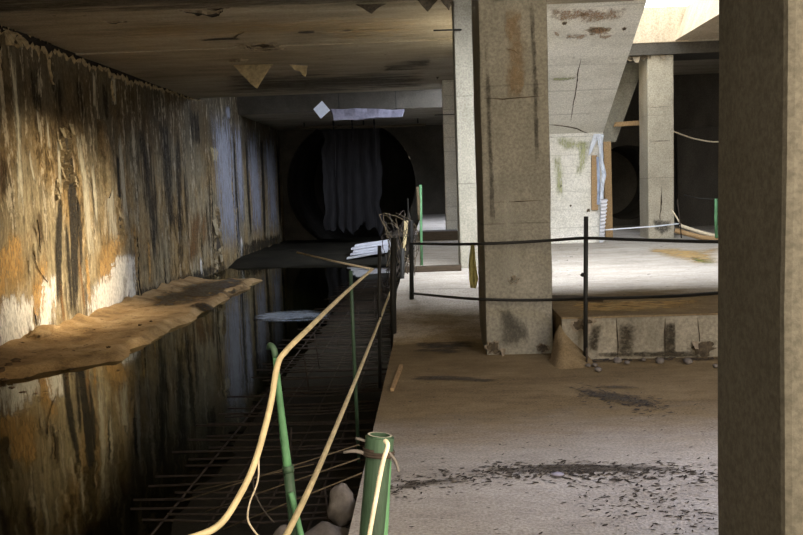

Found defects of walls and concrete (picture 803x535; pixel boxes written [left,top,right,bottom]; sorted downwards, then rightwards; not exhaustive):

water stain [0,0,398,12]
corrosion [553,9,623,39]
crack [549,60,587,133]
spalling [54,123,79,201]
water stain [0,56,243,346]
water stain [206,107,281,257]
water stain [559,139,585,170]
corrosion [100,227,151,283]
corrosion [32,261,47,316]